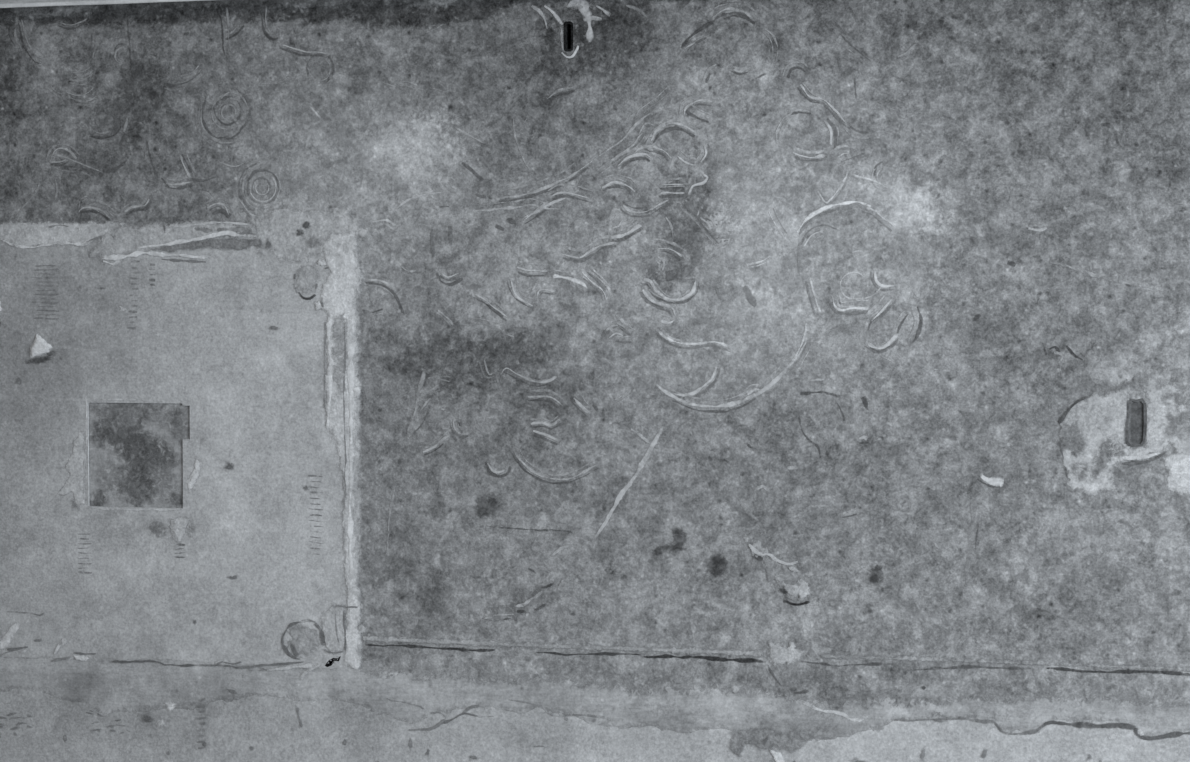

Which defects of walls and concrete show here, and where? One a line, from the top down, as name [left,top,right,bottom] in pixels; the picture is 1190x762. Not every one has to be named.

peeling [0,206,370,669]
spalling [1059,376,1190,496]
spalling [729,727,813,762]